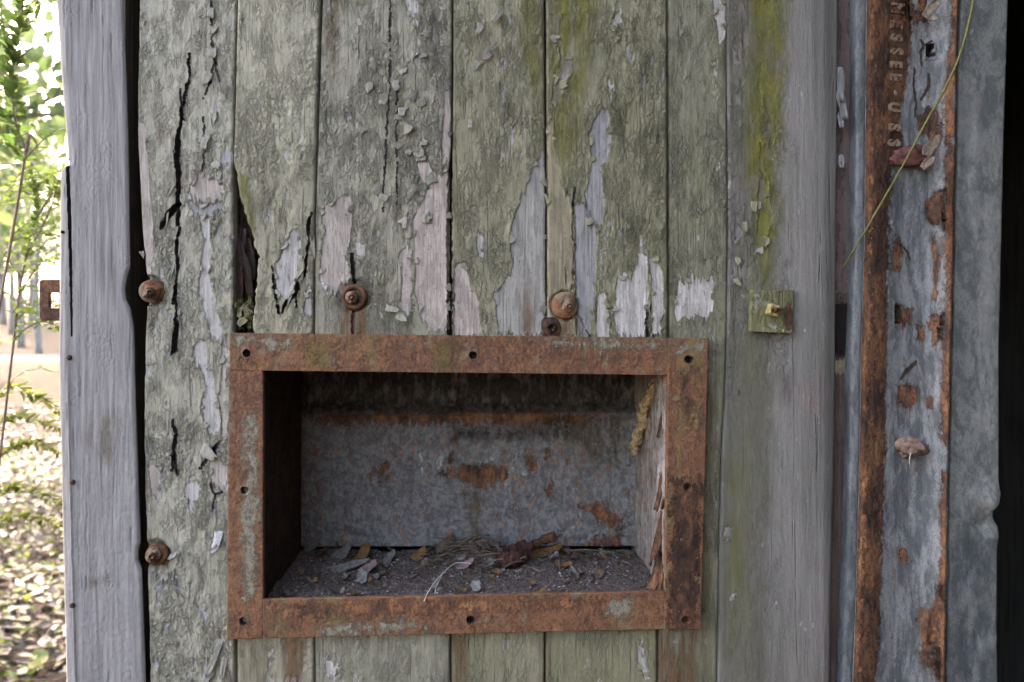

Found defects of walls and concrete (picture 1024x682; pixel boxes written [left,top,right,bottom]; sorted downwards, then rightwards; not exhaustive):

crack [159,0,221,356]
peeling [364,0,714,337]
peeling [274,194,365,316]
peeling [181,159,254,513]
corrosion [853,0,959,682]
crack [169,419,226,512]
corrosion [268,595,606,622]
corrosion [301,404,604,431]
corrosion [439,450,508,492]
corrosion [525,447,551,475]
corrosion [572,498,631,546]
corrosion [646,469,705,682]